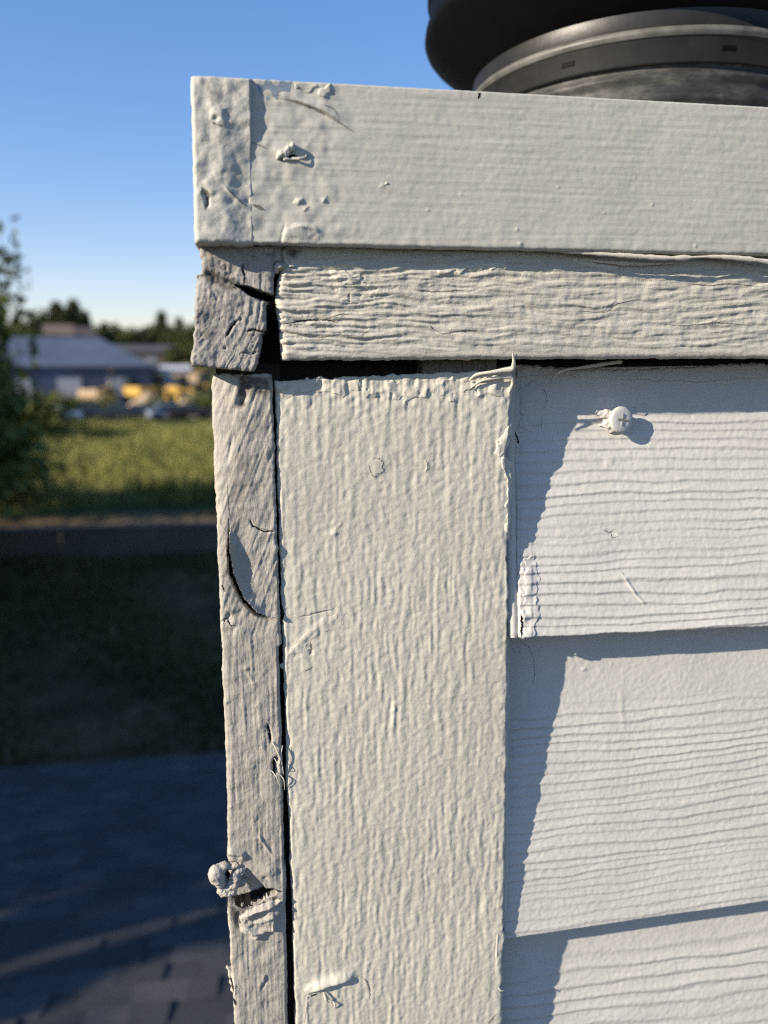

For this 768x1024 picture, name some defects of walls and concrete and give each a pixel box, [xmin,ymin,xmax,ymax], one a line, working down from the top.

peeling [251,79,332,100]
crack [225,320,268,355]
peeling [276,352,516,405]
peeling [494,422,513,541]
crack [222,484,331,626]
peeling [521,555,541,639]
crack [266,722,285,790]